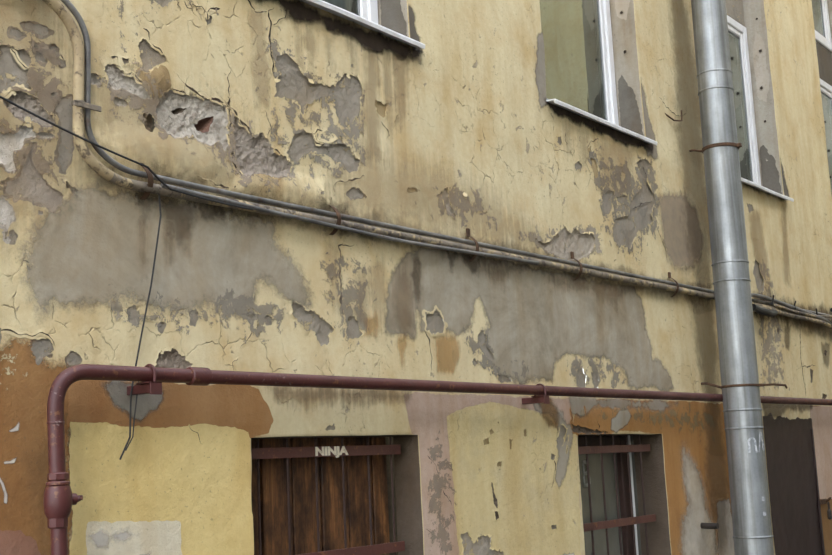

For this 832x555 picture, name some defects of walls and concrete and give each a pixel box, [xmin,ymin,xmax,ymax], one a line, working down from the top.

crack [176,0,220,20]
crack [246,0,287,78]
peeling [0,21,85,245]
flaking render [91,27,390,203]
peeling [517,137,660,266]
water stain [274,386,409,405]
peeling [422,305,448,337]
peeling [463,323,529,385]
flaking render [566,354,632,388]
flaking render [427,432,507,555]